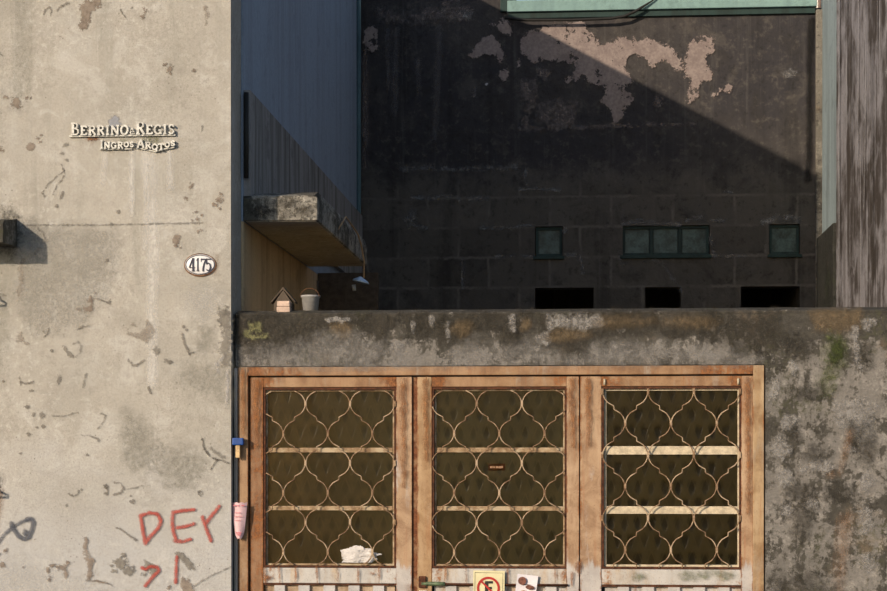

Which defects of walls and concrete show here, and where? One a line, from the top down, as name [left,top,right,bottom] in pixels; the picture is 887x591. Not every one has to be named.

peeling [362,25,379,53]
peeling [468,17,716,128]
water stain [233,308,657,363]
water stain [667,311,812,357]